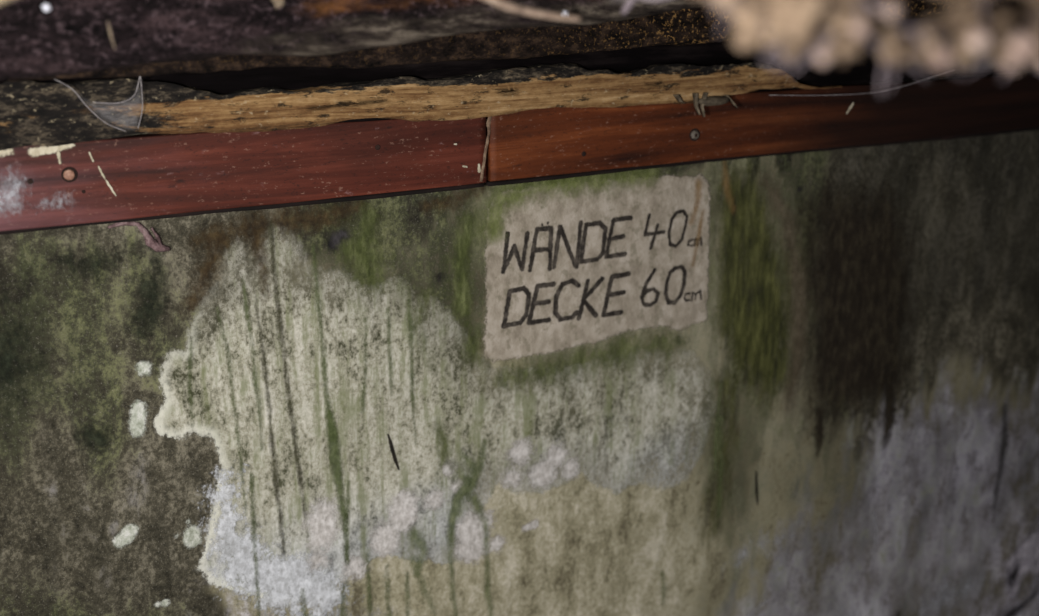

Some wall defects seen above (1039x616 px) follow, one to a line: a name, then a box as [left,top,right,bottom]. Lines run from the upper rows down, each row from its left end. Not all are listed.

water stain [237,204,365,340]
water stain [775,181,913,455]
water stain [198,349,504,616]
water stain [503,437,579,487]